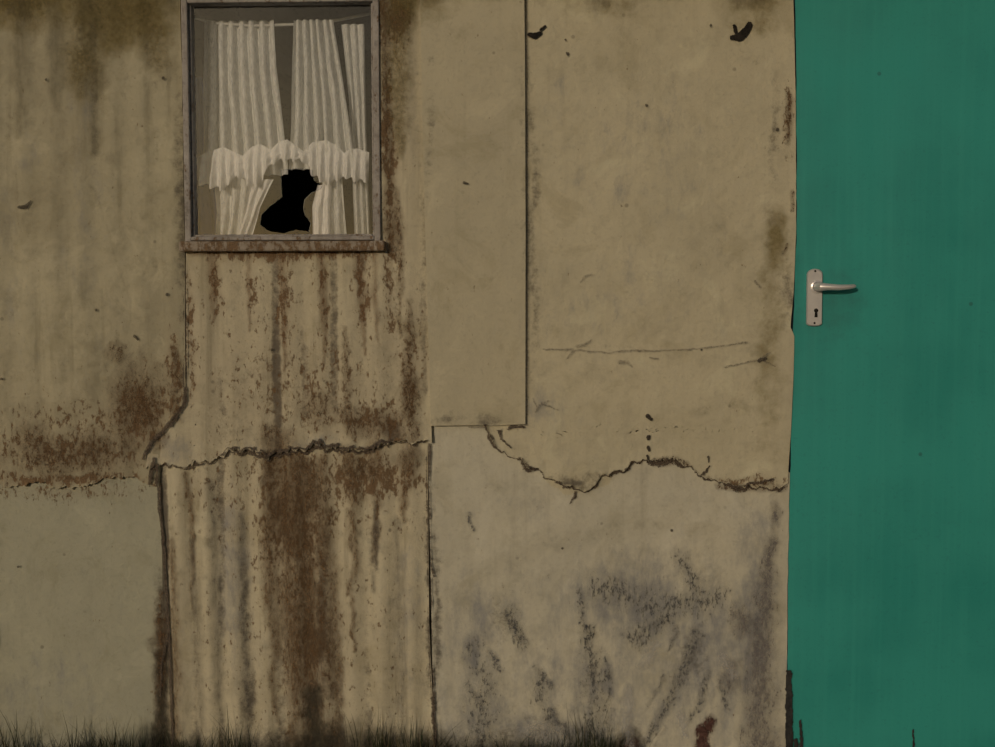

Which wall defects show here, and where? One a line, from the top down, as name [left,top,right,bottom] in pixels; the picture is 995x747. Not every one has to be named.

crack [469,0,785,504]
rust [342,293,421,521]
rust [263,424,349,747]
leakage [288,687,453,747]
leakage [578,555,731,743]